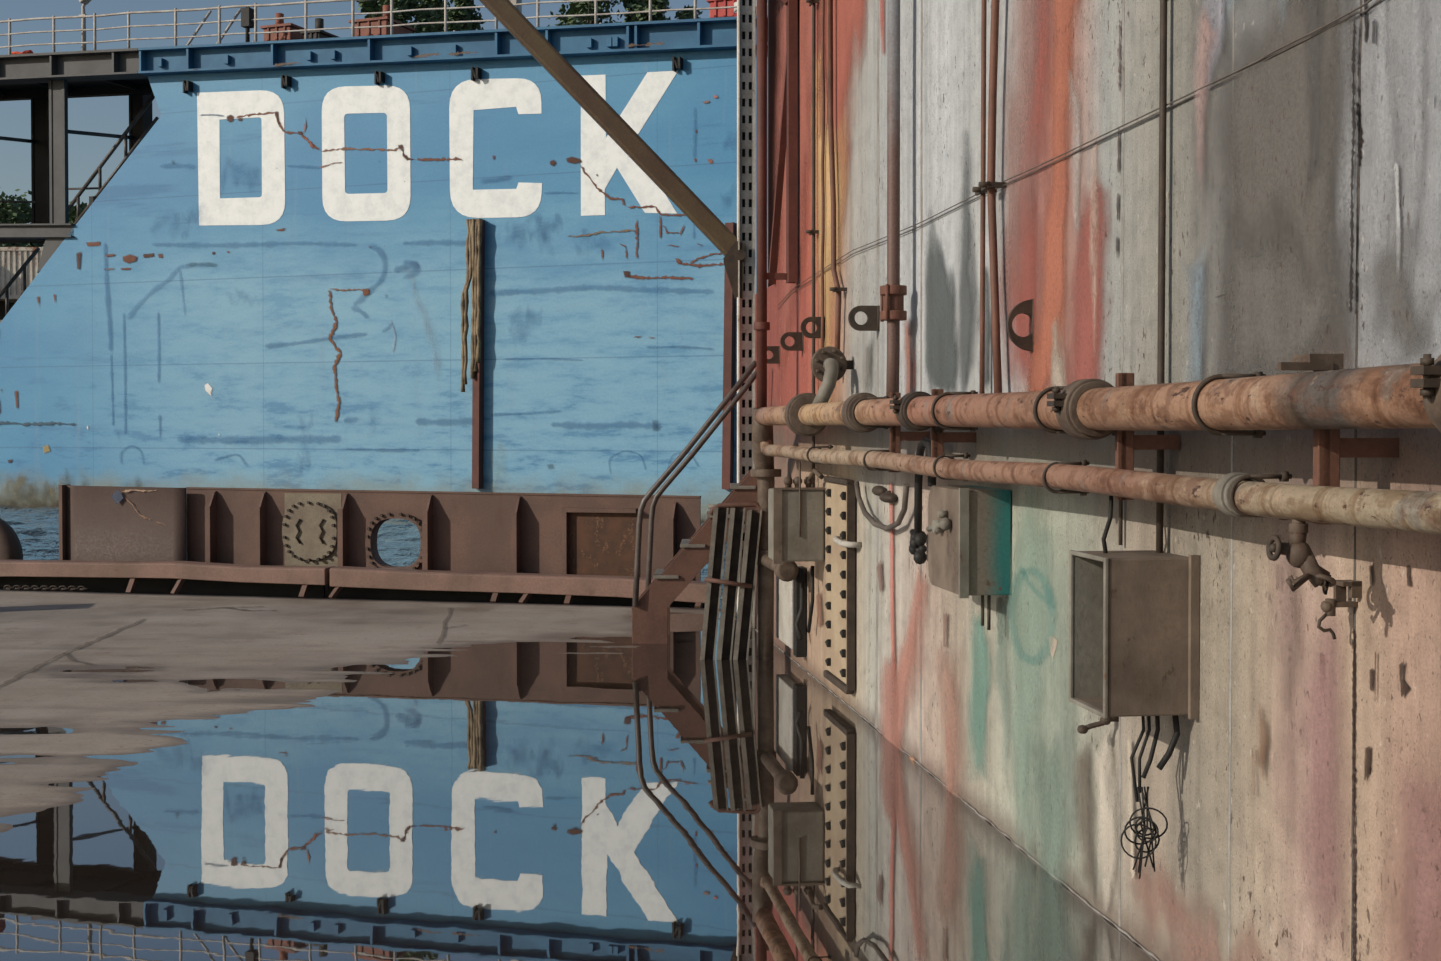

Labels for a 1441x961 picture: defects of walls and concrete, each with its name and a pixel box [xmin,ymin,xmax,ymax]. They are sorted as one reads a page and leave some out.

rust [76,242,163,270]
rust [569,222,723,280]
rust [328,288,369,422]
rust [0,391,75,426]